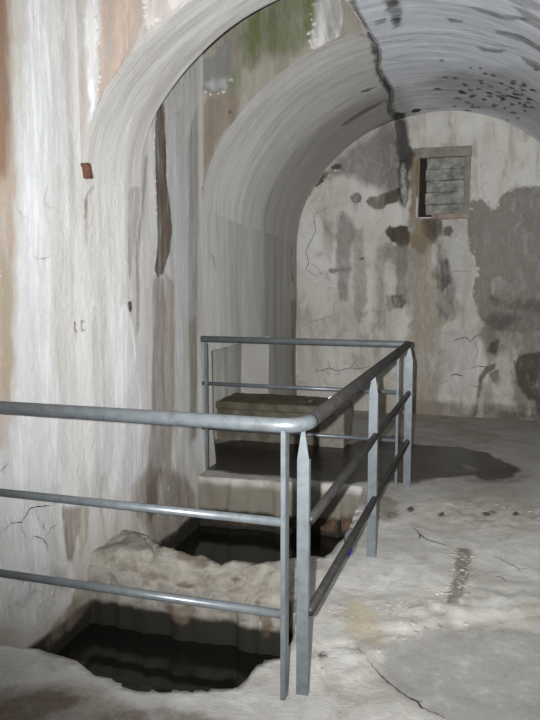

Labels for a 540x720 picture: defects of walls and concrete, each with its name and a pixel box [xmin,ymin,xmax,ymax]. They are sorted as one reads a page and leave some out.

damp [479,73,535,114]
damp [386,226,410,308]
damp [422,218,471,272]
crack [311,353,370,375]
damp [512,331,540,411]
damp [209,440,368,483]
damp [378,437,519,483]
crack [0,504,56,553]
crack [356,647,449,720]